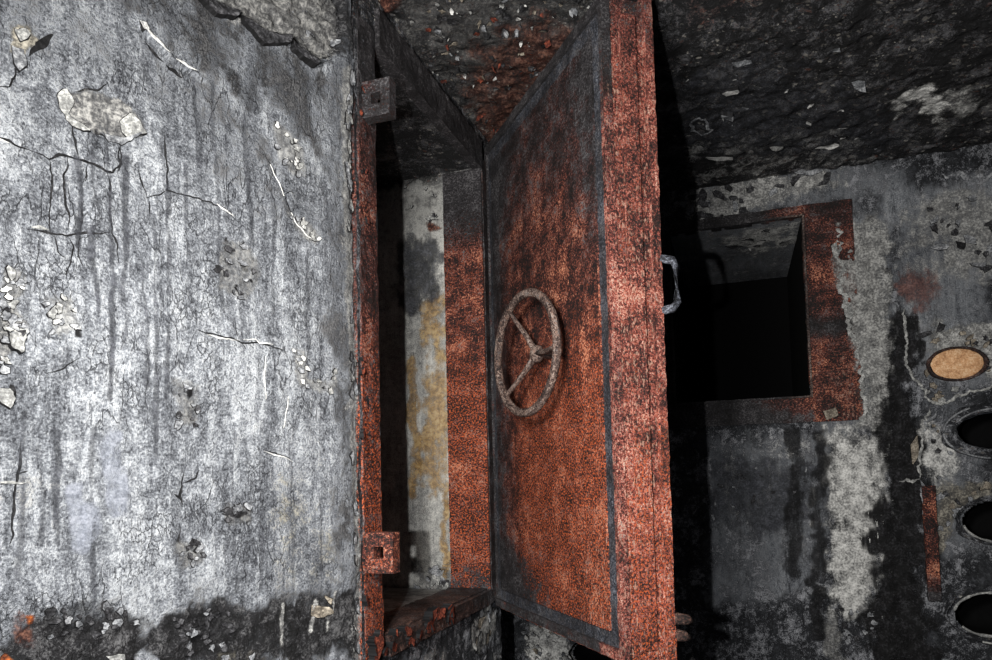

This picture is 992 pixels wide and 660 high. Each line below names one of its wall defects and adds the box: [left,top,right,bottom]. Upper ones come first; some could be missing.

spalling [0,25,53,87]
spalling [198,0,342,69]
corrosion [466,14,571,138]
spalling [56,83,147,147]
crack [0,126,234,277]
peeling [0,265,30,409]
damp [396,236,450,579]
damp [919,423,960,480]
peeling [179,538,207,568]
peeling [43,600,140,640]
peeling [172,607,235,660]
damp [309,591,337,633]